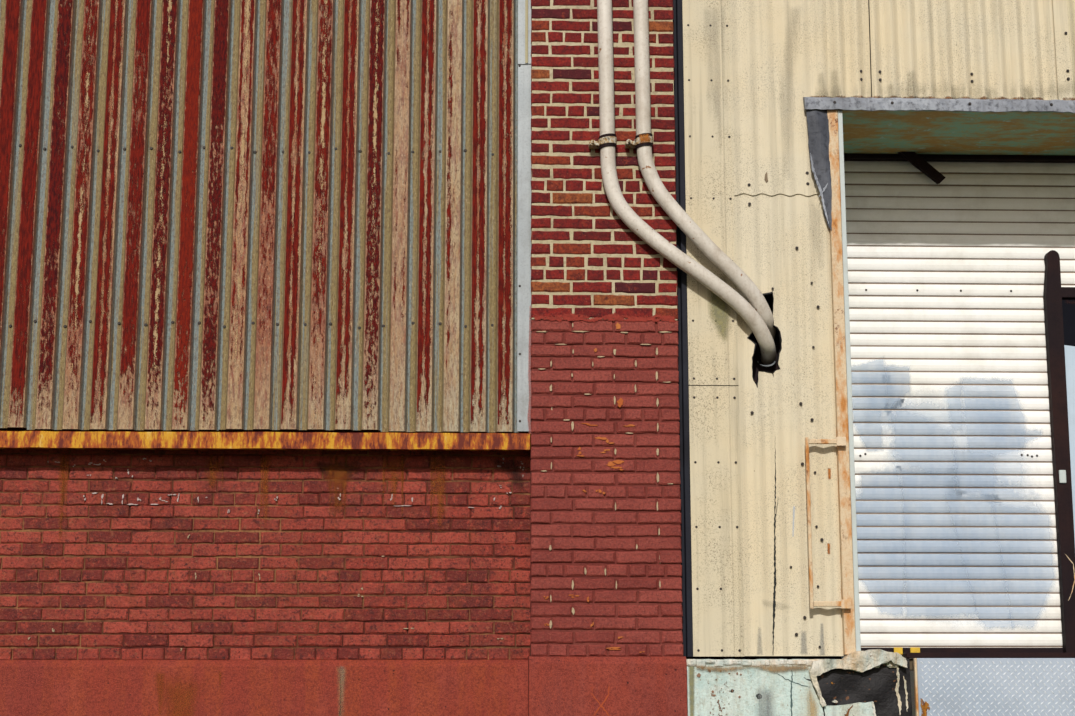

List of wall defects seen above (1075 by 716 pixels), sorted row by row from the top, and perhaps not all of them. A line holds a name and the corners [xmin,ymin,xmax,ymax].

hole [747,291,782,387]
crack [772,449,825,716]
spalling [809,649,912,716]